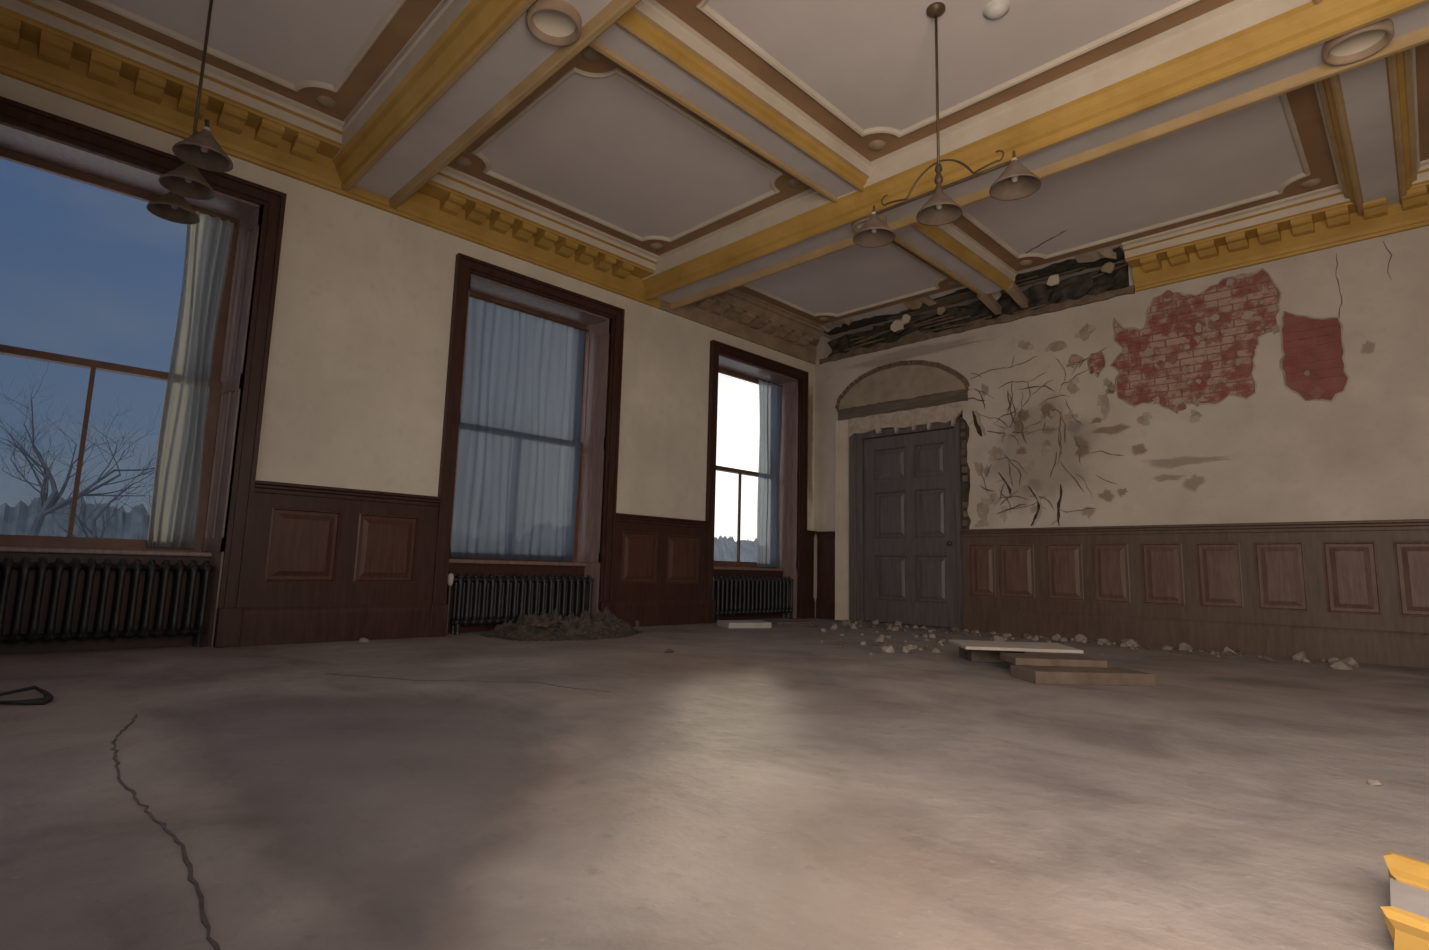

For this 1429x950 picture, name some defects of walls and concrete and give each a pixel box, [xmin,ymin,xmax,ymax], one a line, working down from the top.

spalling [1018,268,1351,426]
crack [111,714,221,950]